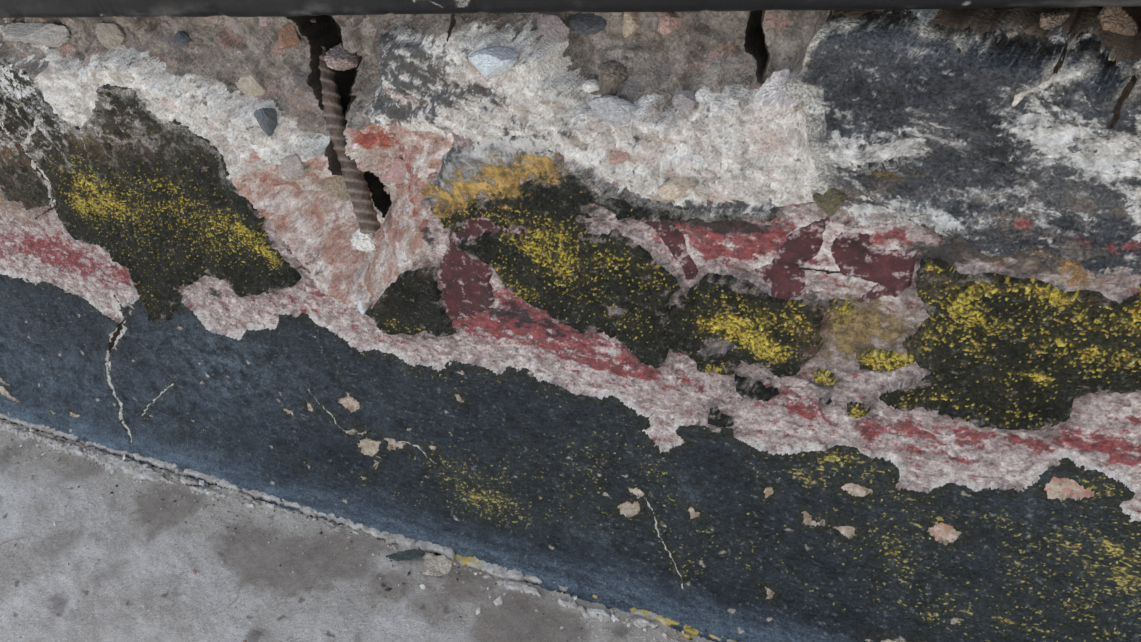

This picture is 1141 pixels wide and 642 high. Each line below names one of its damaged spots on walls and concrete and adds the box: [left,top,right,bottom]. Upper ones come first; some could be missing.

crack [1012,7,1088,107]
crack [1109,75,1137,129]
peeling [0,10,1141,522]
crack [0,294,272,505]